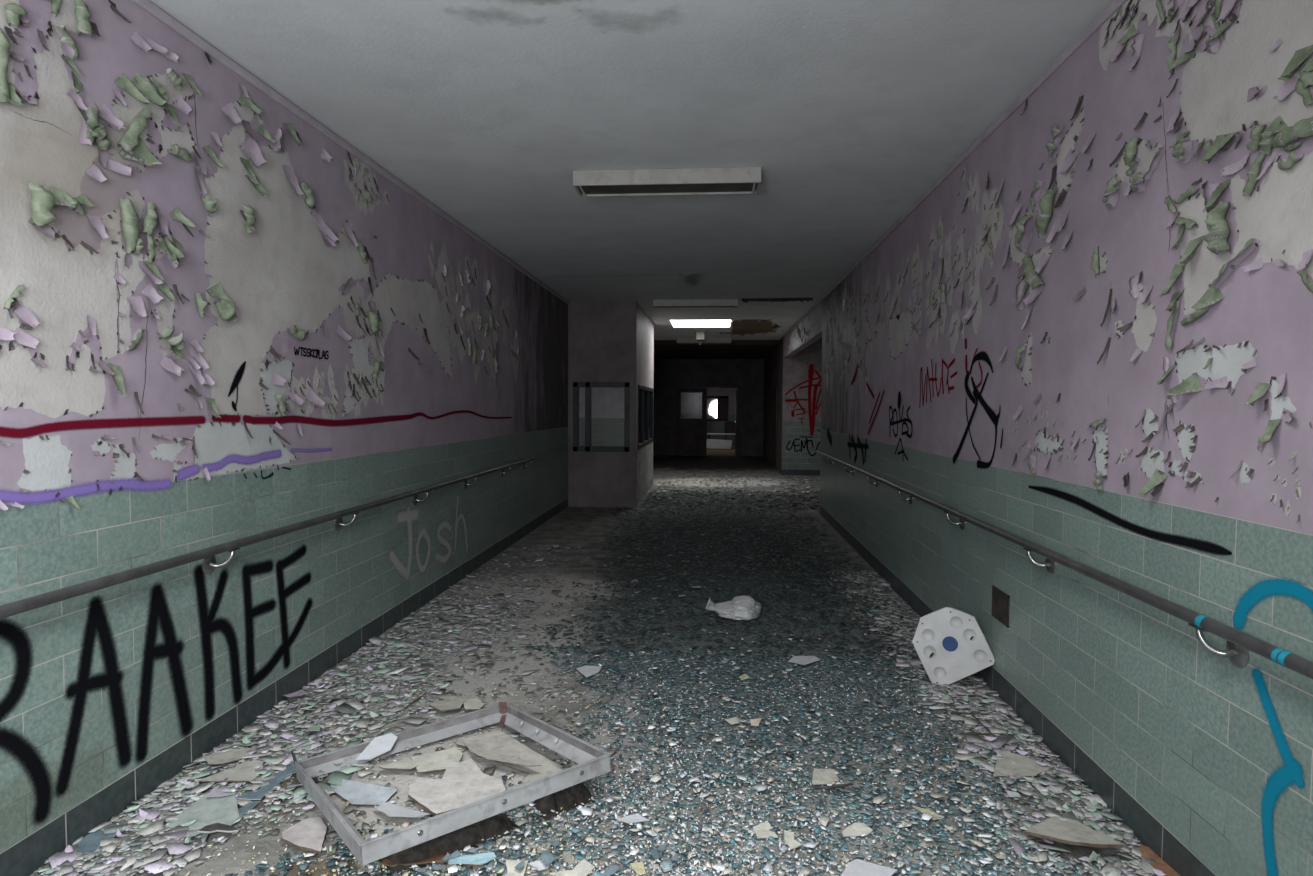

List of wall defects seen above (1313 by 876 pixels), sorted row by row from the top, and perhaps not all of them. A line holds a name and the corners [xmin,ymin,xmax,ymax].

peeling [0,435,80,511]
peeling [0,0,519,496]
spalling [718,298,821,351]
peeling [888,0,1313,523]